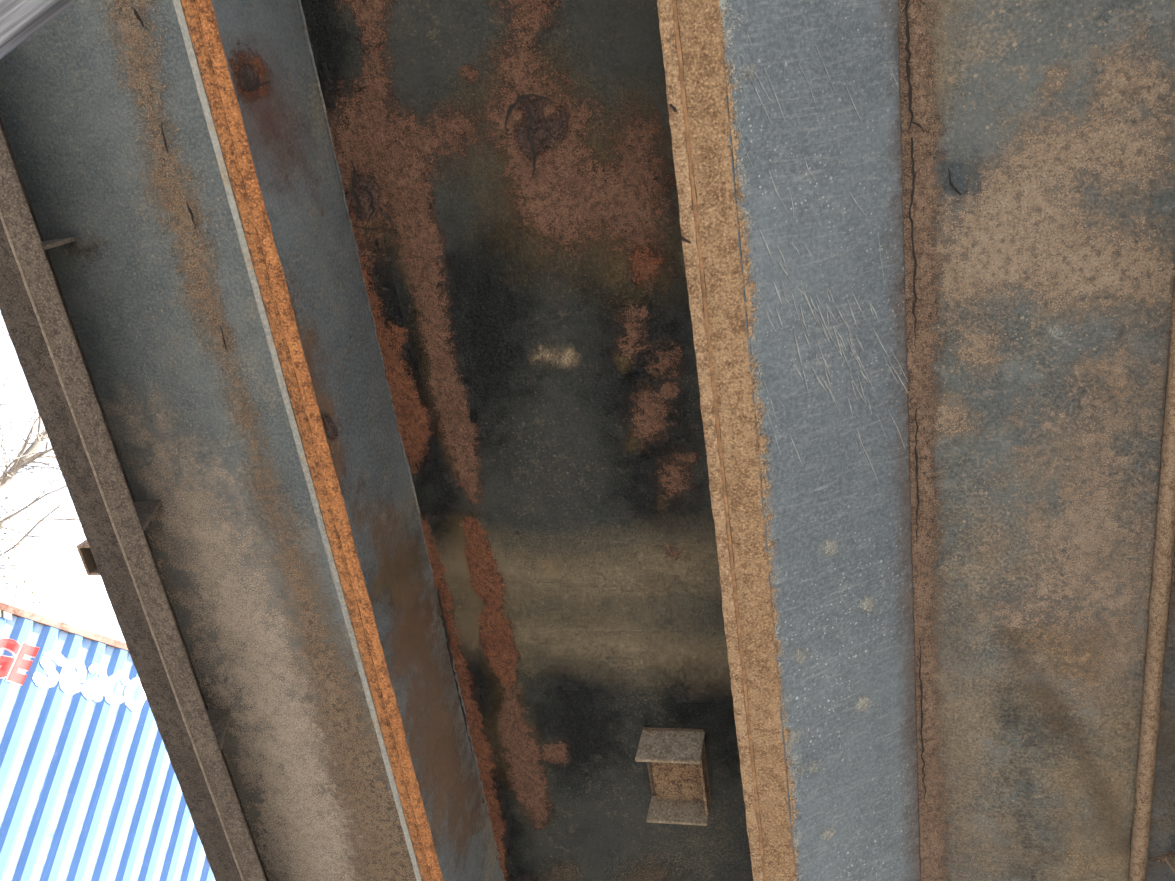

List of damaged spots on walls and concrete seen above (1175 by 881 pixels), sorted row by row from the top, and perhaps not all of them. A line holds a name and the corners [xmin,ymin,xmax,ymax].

rust [104,0,417,881]
rust [326,0,700,881]